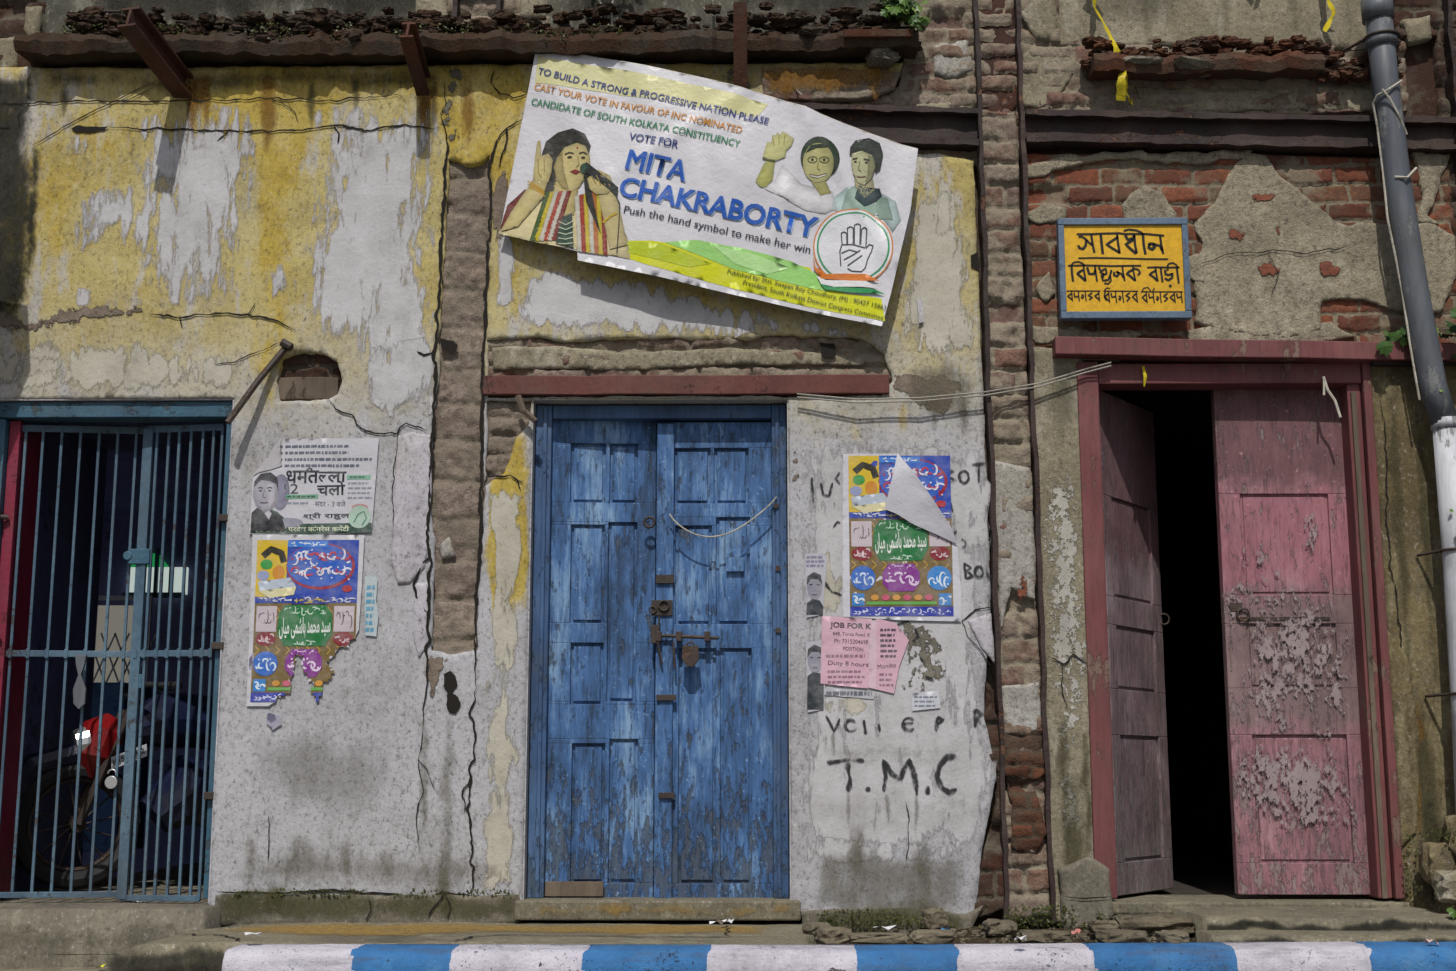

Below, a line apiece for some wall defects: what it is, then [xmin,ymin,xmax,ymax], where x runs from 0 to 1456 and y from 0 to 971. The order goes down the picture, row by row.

leakage [0,78,38,318]
peeling [0,288,243,392]
peeling [70,105,255,303]
spalling [1252,154,1388,226]
spalling [1319,261,1342,276]
spalling [1320,299,1408,342]
spalling [1409,159,1455,235]
spalling [1434,278,1456,343]
crack [0,68,527,941]
peeling [267,67,962,890]
peeling [792,111,1241,923]
peeling [1223,543,1358,828]